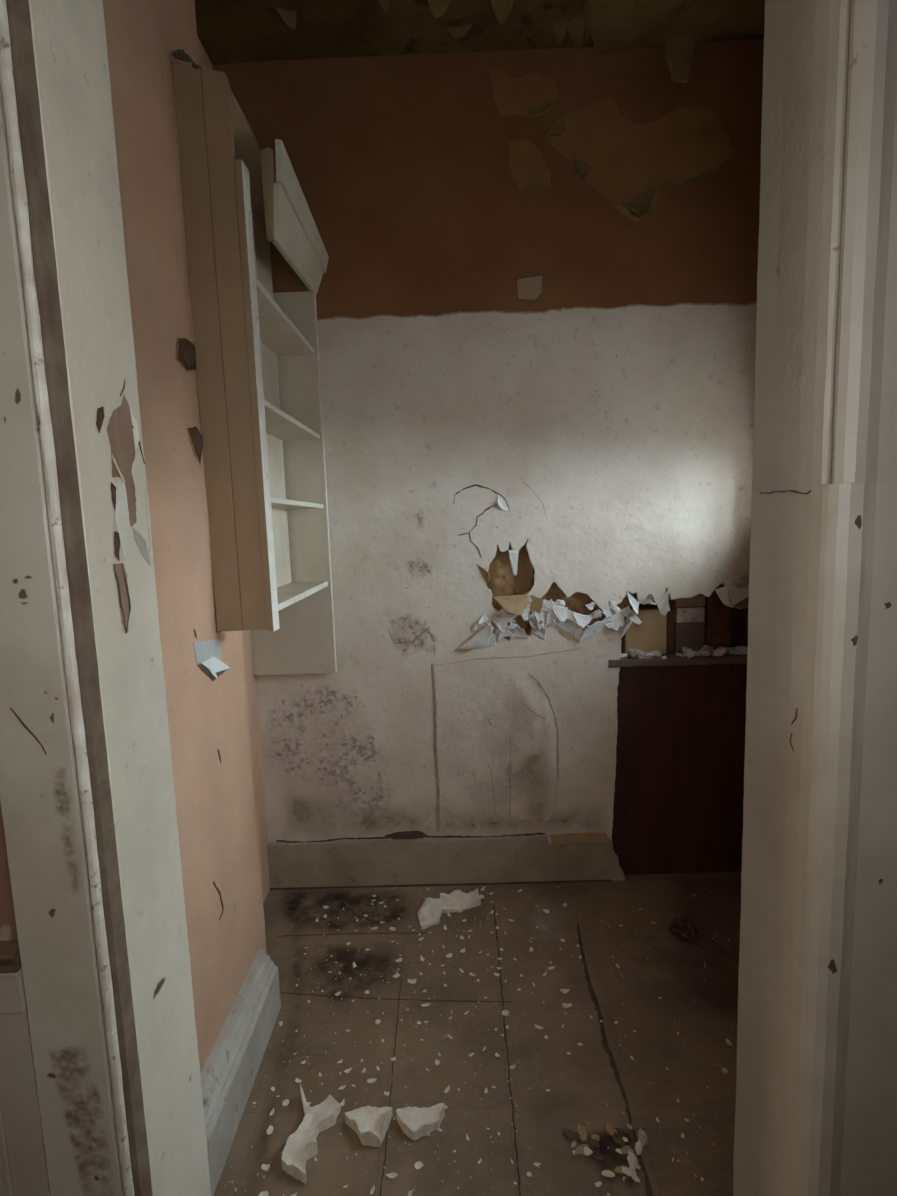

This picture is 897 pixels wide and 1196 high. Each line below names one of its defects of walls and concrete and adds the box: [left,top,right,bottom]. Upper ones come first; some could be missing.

spalling [187,426,204,466]
peeling [96,379,152,634]
crack [453,476,547,558]
spalling [477,543,536,629]
peeling [569,599,613,627]
spalling [730,607,748,647]
damp [289,894,404,929]
damp [318,949,388,999]
crack [576,920,653,1196]